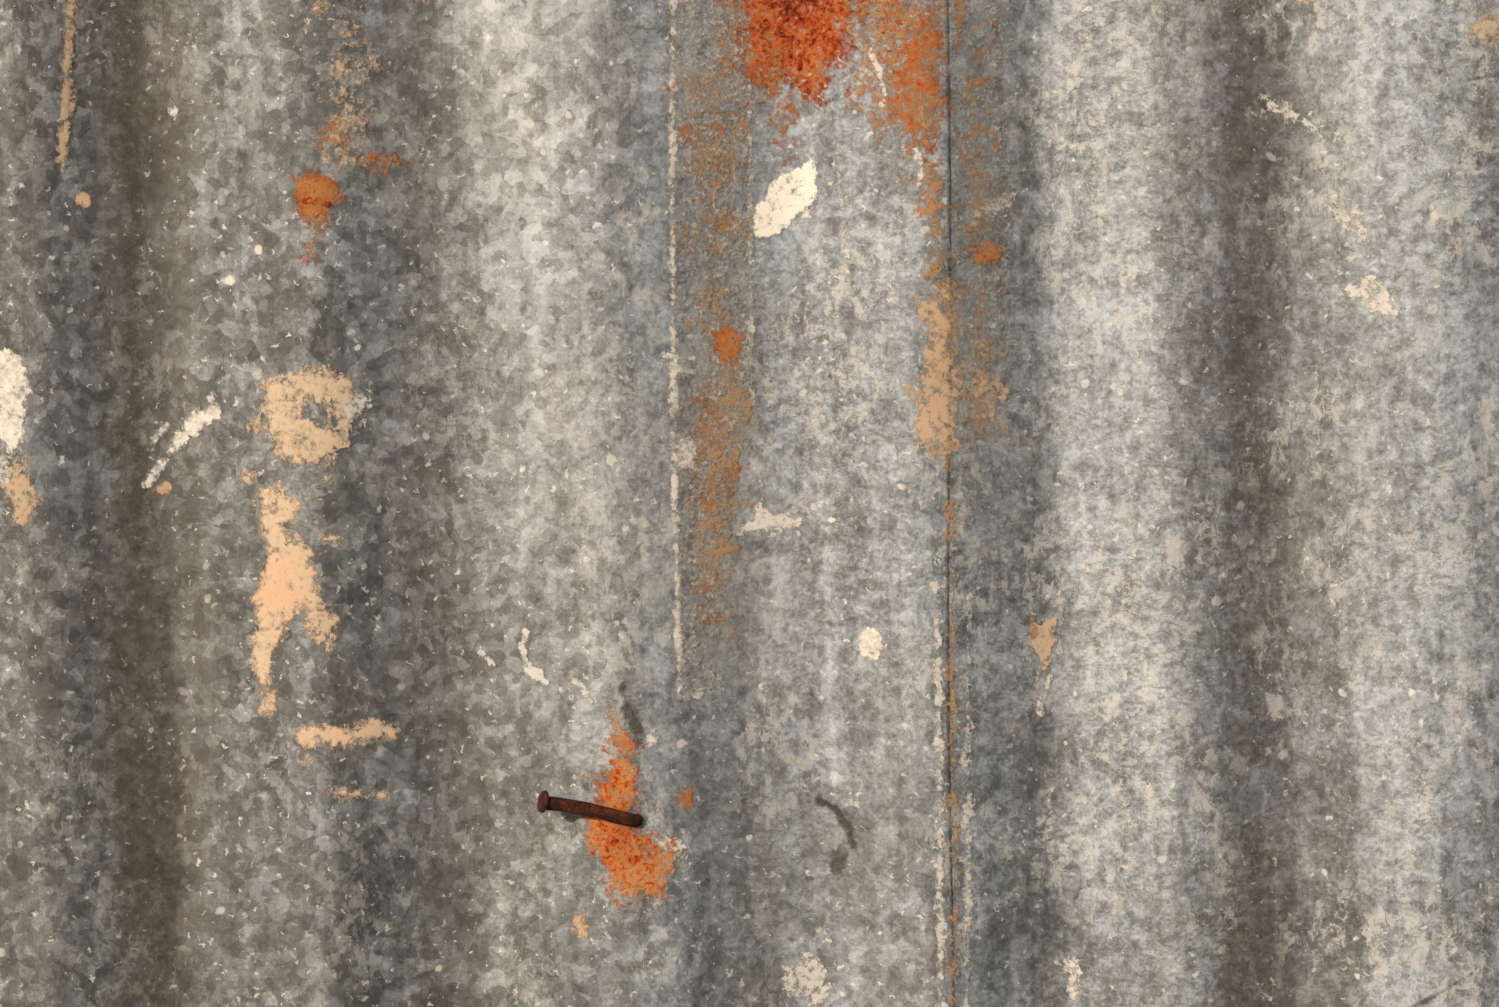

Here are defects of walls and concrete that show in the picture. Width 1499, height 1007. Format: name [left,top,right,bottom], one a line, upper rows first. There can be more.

corrosion [291,21,410,266]
corrosion [665,0,1012,1007]
corrosion [583,683,691,907]
corrosion [571,915,590,938]